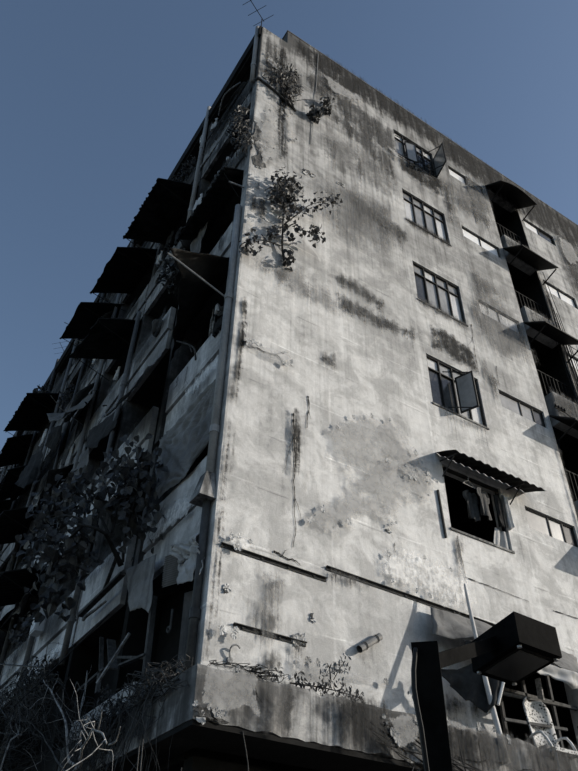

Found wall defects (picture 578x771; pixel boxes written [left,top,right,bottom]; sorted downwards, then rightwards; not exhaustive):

water stain [265,35,578,297]
water stain [252,196,266,220]
water stain [260,261,415,338]
water stain [529,281,559,328]
water stain [231,297,248,397]
water stain [432,328,495,385]
water stain [293,408,301,472]
water stain [260,598,295,734]
water stain [337,693,407,755]
peeling [381,714,402,747]
water stain [446,696,520,771]
water stain [526,740,578,771]